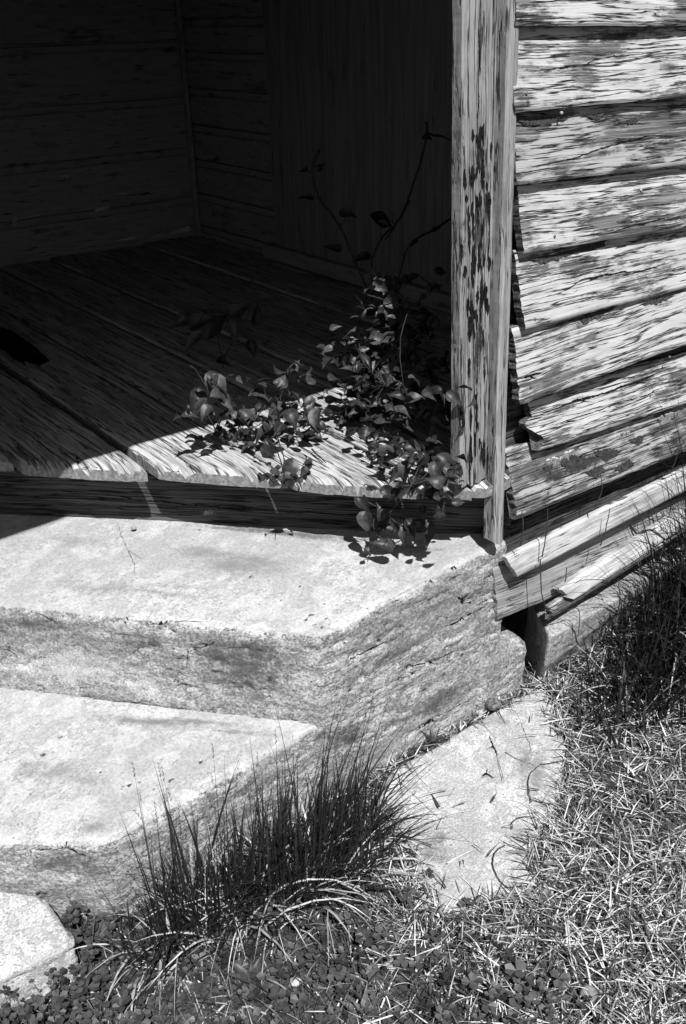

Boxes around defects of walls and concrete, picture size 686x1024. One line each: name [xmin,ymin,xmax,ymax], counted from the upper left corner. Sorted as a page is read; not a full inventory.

peeling [461,124,496,384]
crack [524,259,679,301]
peeling [459,394,490,486]
peeling [542,448,634,479]